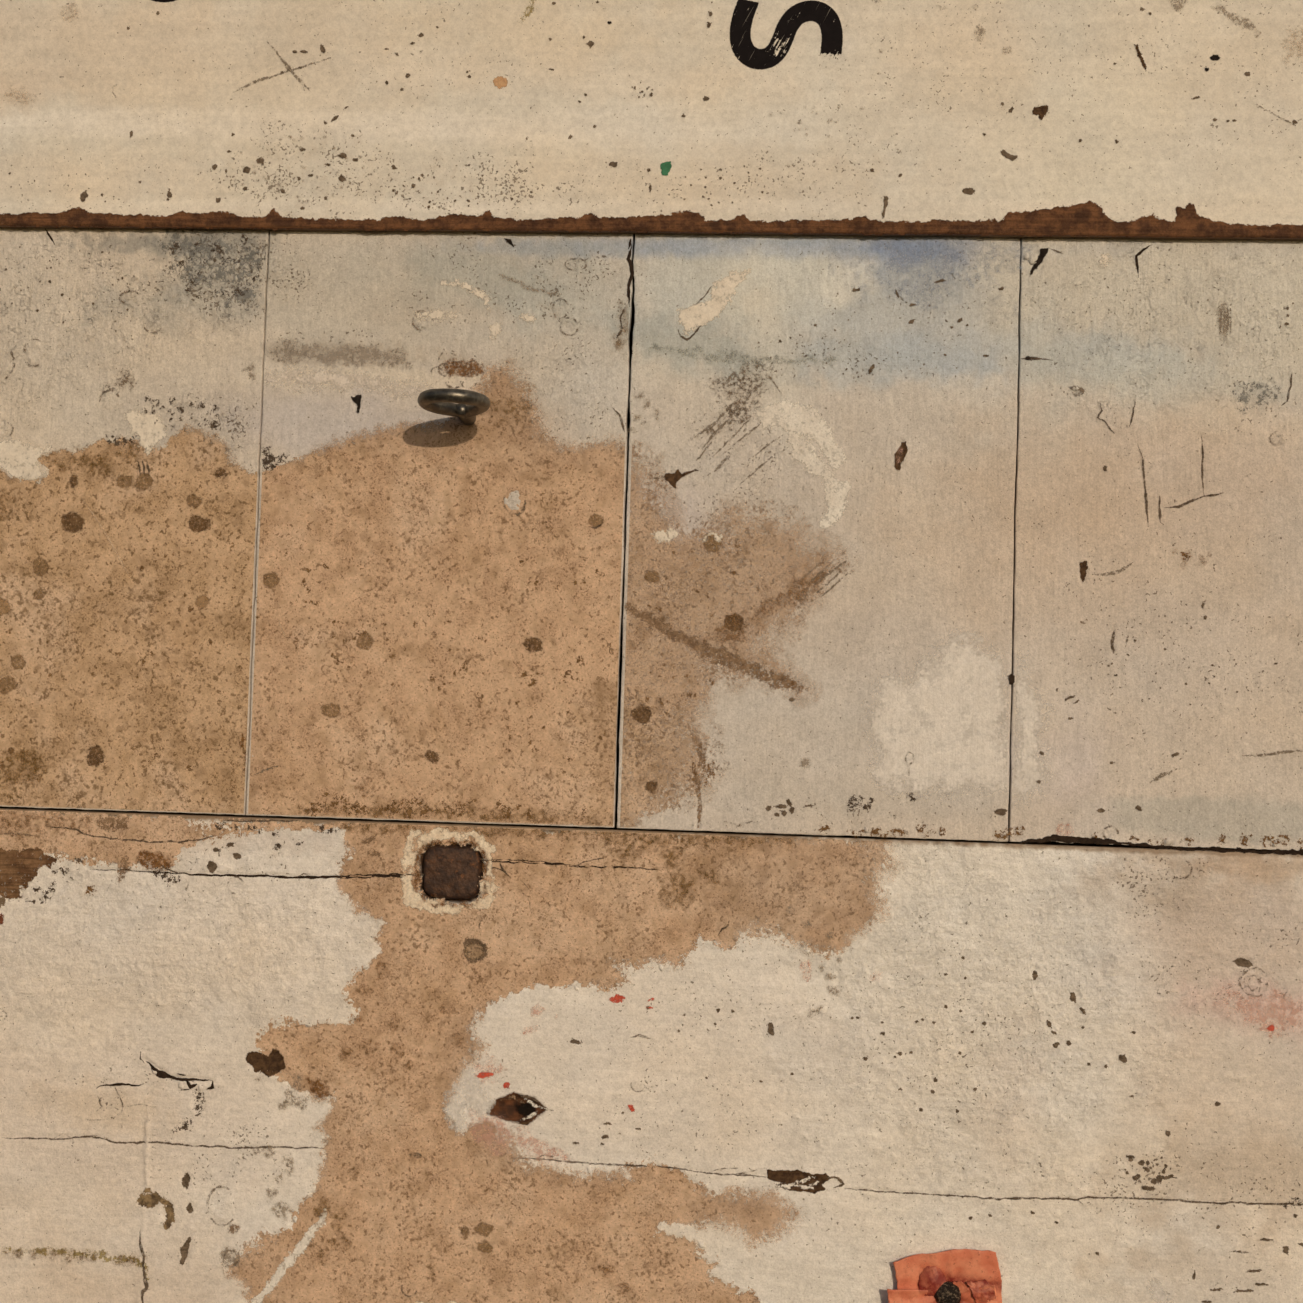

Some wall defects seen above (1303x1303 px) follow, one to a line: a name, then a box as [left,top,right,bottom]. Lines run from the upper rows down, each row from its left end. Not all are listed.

peeling [0,365,946,1303]
rust [413,840,489,908]
crack [520,1155,758,1177]
crack [845,1188,1303,1206]